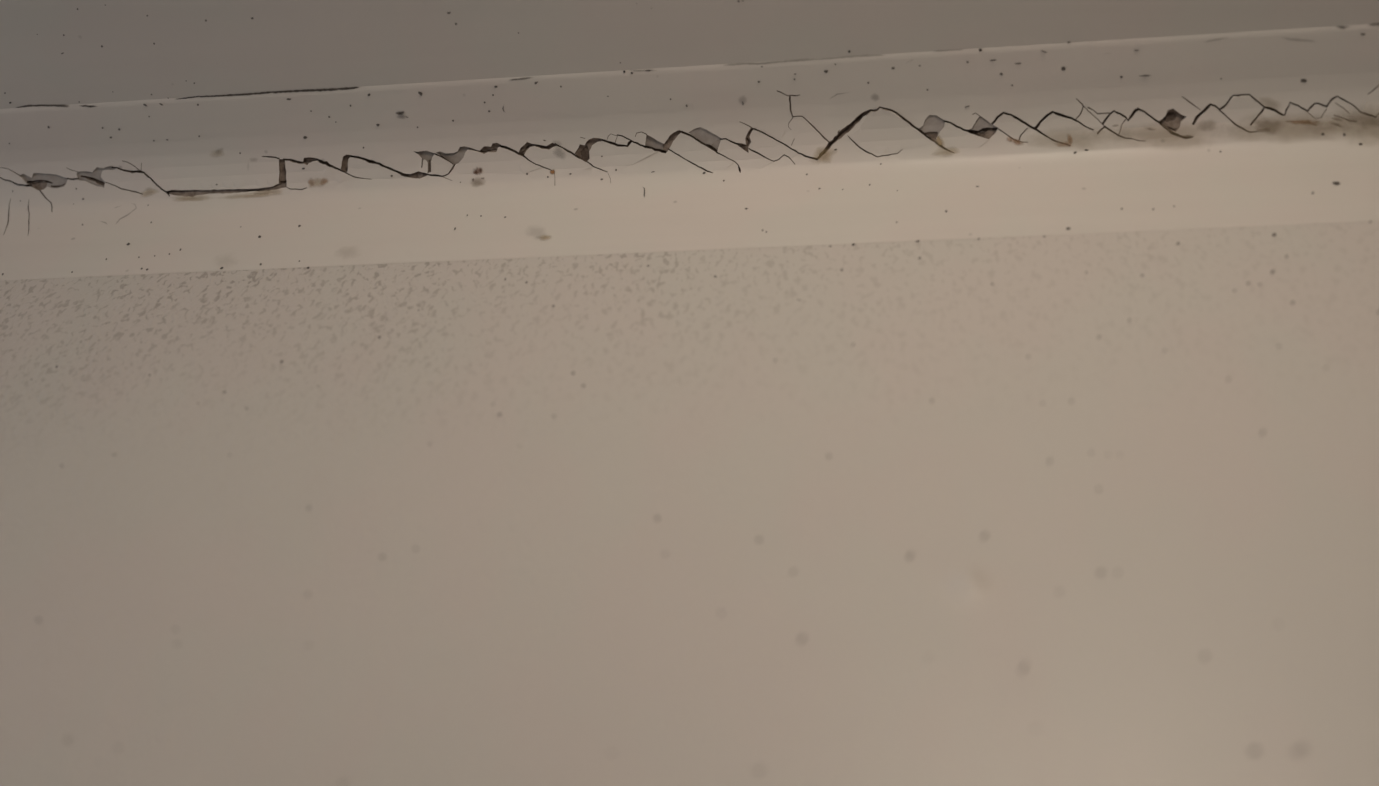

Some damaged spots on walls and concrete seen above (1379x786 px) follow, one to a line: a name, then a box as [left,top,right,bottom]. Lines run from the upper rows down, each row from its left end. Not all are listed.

crack [101,85,1379,197]
crack [0,167,52,235]